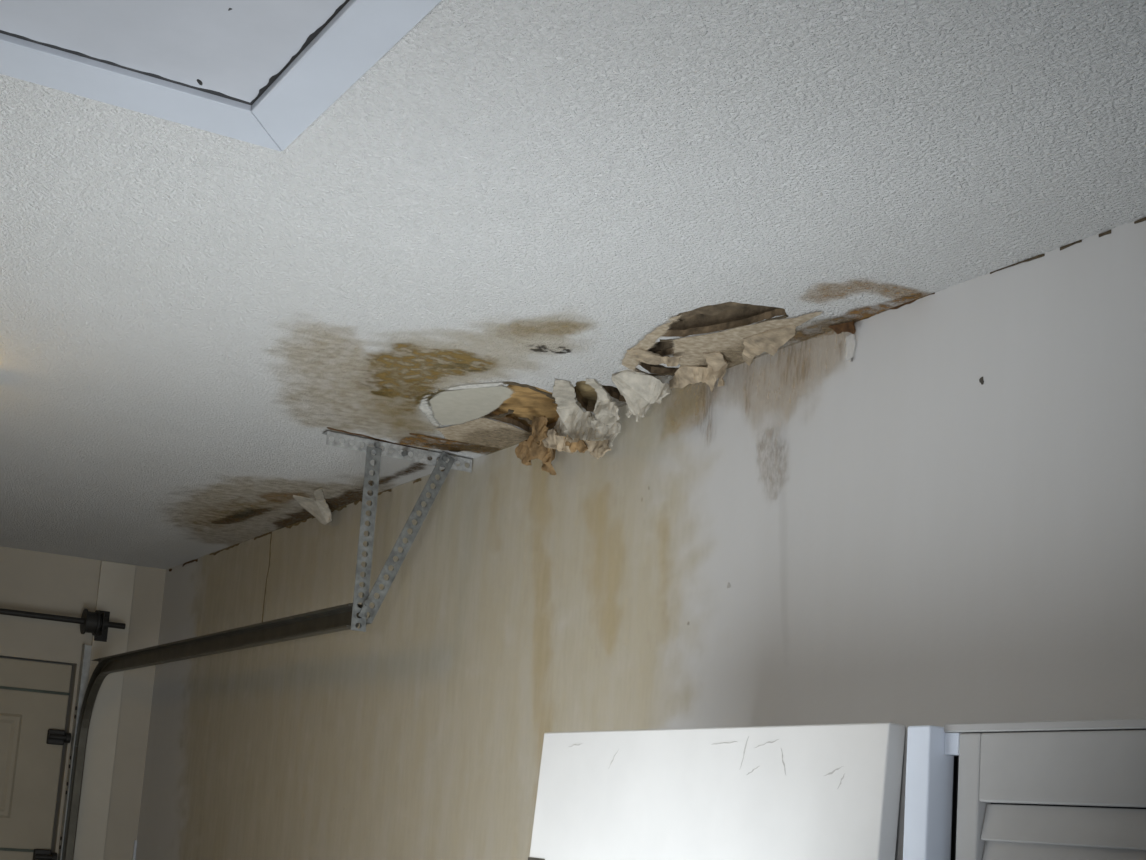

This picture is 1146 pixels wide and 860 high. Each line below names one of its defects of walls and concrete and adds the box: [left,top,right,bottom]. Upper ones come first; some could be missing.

damp [370,344,494,411]
peeling [515,315,728,475]
damp [214,493,314,528]
damp [325,458,432,510]